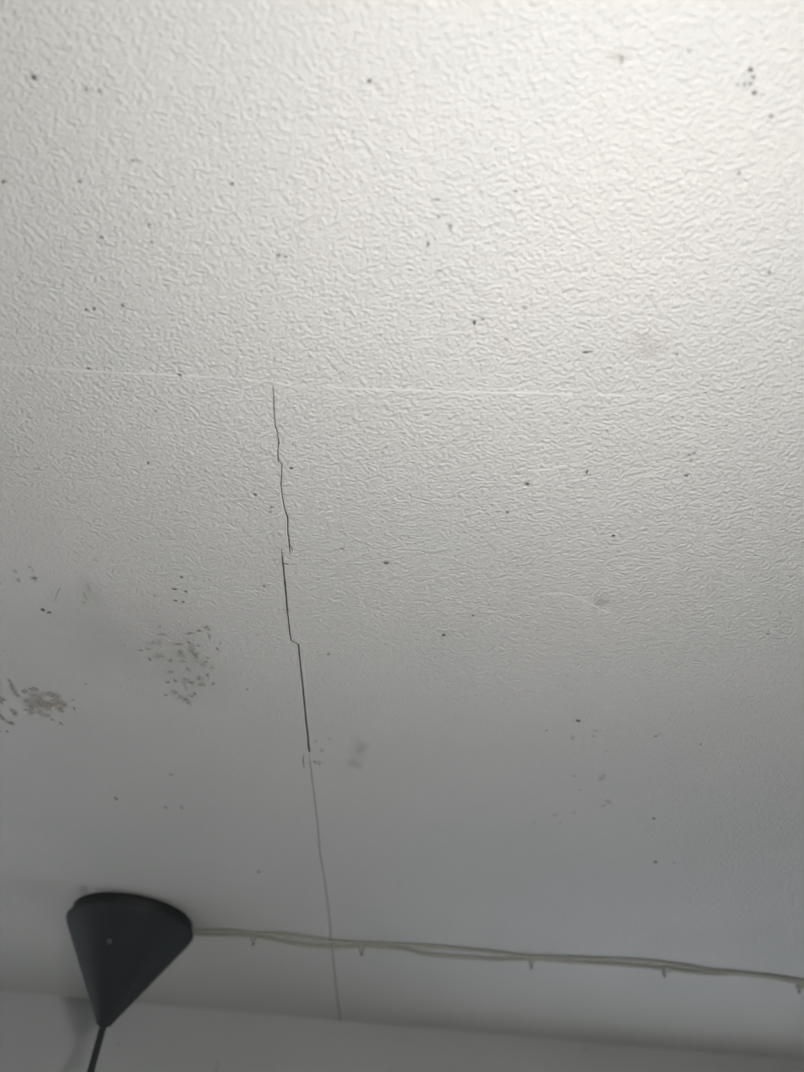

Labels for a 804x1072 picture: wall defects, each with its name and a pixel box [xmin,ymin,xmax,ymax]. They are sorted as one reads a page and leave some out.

crack [273,386,341,1021]